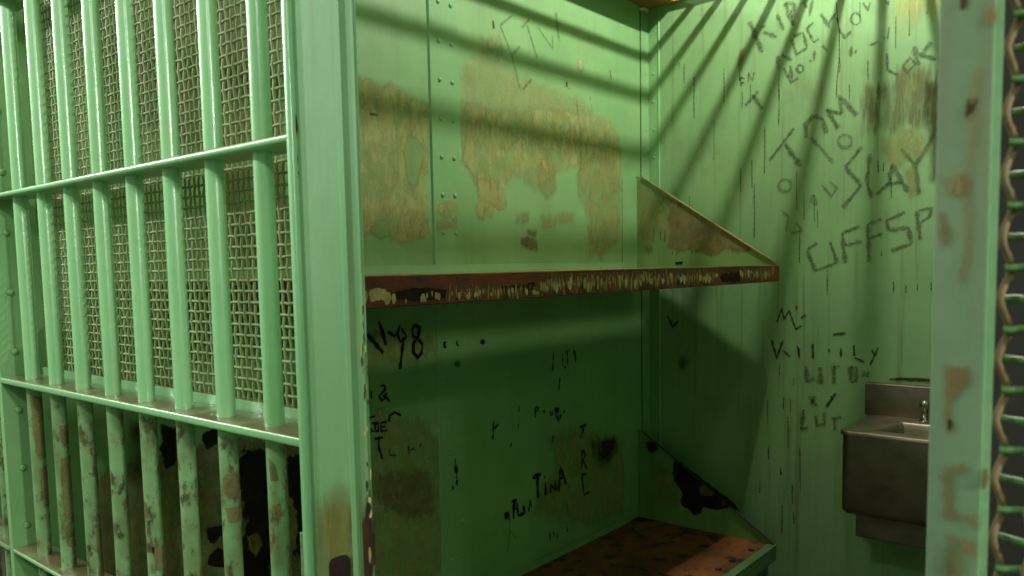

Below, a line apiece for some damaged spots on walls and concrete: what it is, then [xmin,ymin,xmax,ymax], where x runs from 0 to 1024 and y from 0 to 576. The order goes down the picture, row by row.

peeling [358,78,430,242]
peeling [360,185,775,405]
rust [30,397,49,506]
rust [61,456,74,518]
rust [96,530,104,576]
rust [222,477,242,523]
peeling [366,462,376,573]
peeling [656,461,740,515]